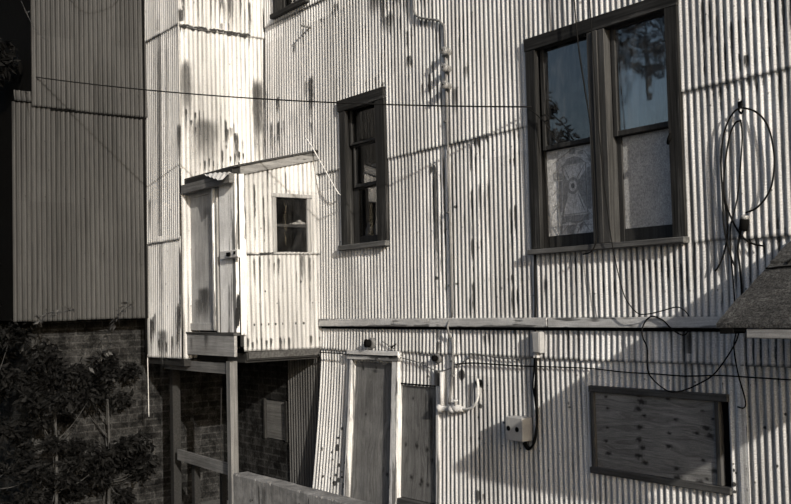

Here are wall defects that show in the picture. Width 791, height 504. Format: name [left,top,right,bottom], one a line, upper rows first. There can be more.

water stain [182,63,190,103]
water stain [197,122,210,145]
corrosion [204,120,244,171]
water stain [252,83,262,138]
corrosion [263,15,280,158]
corrosion [365,0,429,88]
corrosion [422,25,442,117]
corrosion [690,1,781,110]
corrosion [759,0,791,61]
corrosion [430,136,488,293]
corrosion [464,189,482,318]
corrosion [247,337,290,352]